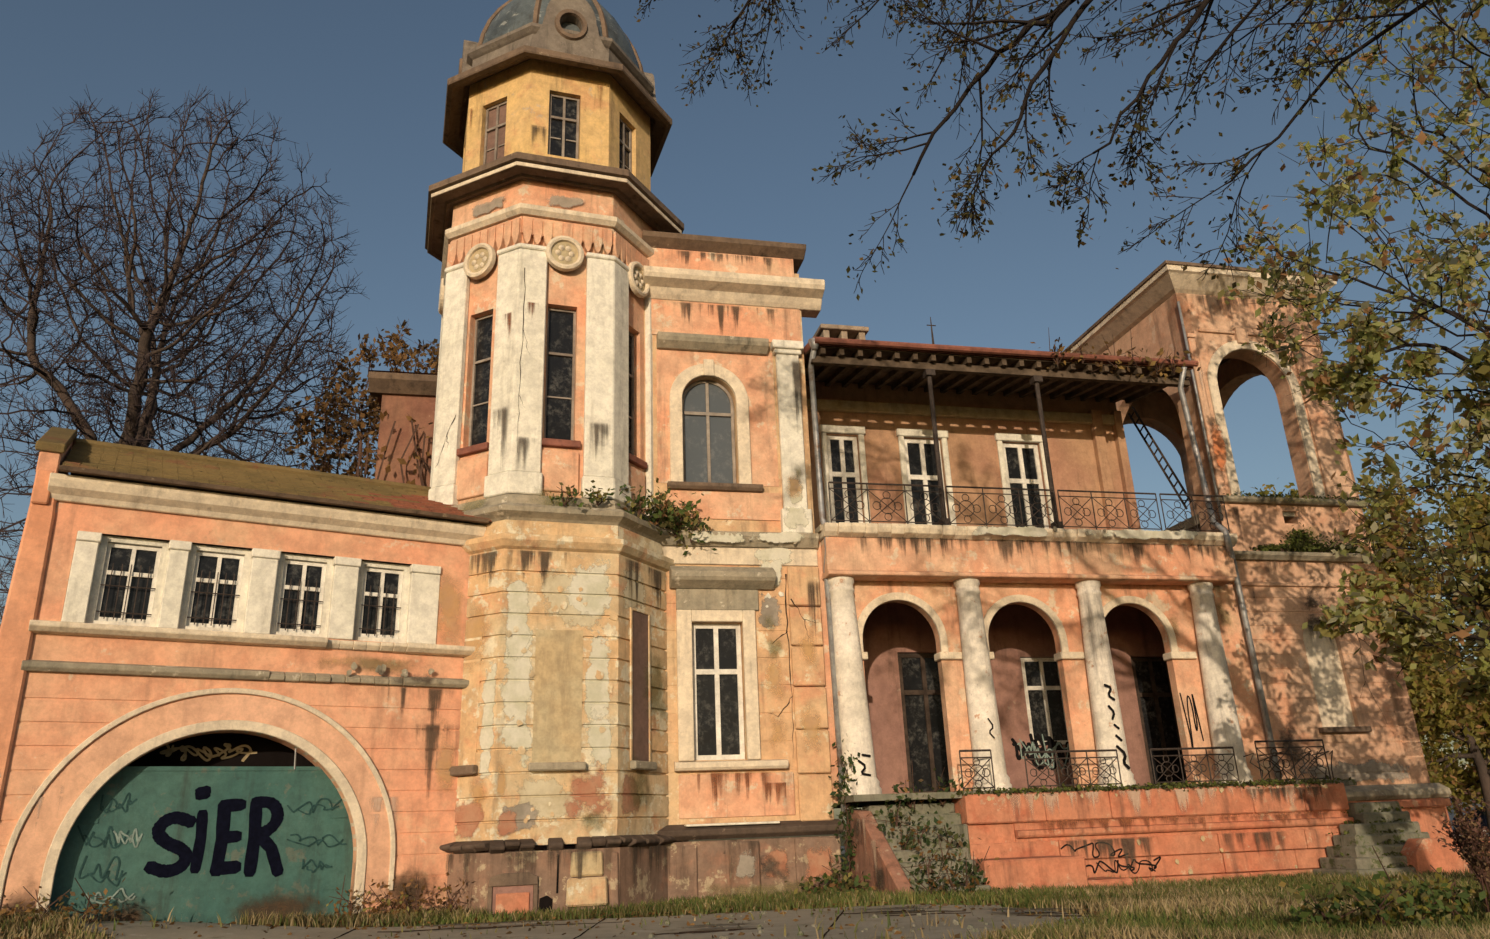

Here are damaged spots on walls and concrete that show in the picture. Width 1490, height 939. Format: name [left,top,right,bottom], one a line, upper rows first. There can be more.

damp [497,408,528,460]
damp [591,423,608,455]
damp [878,537,967,553]
damp [998,539,1091,557]
damp [1124,543,1215,561]
damp [437,577,485,660]
flaking render [455,558,646,837]
damp [424,689,453,787]